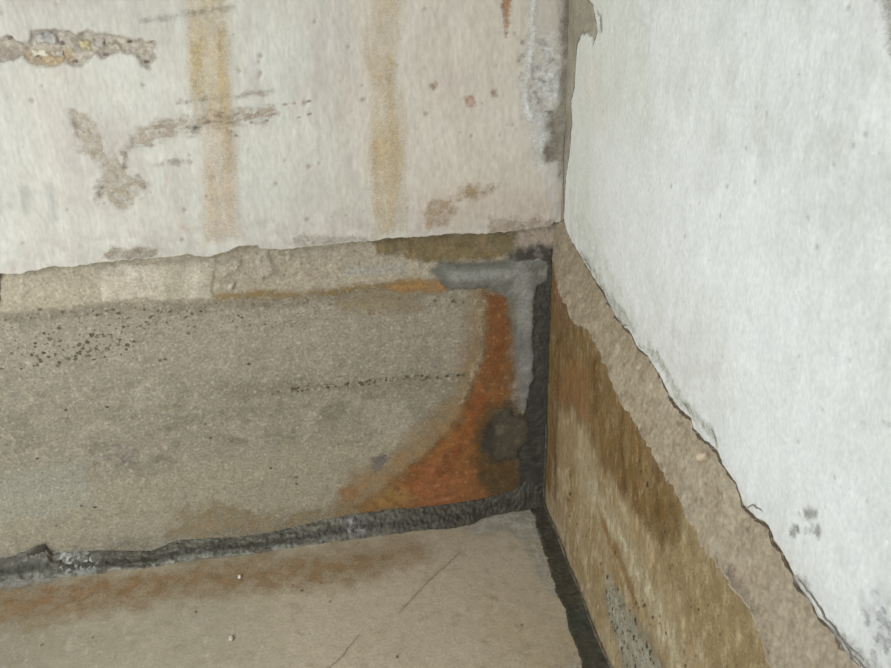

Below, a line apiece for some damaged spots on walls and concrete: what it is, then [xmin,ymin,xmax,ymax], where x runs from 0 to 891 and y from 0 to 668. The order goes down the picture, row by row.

flaking render [0,29,156,68]
peeling [544,0,601,224]
rust [387,279,447,293]
rust [338,293,519,515]
damp [546,272,764,668]
rust [0,548,418,622]
spalling [603,572,662,668]